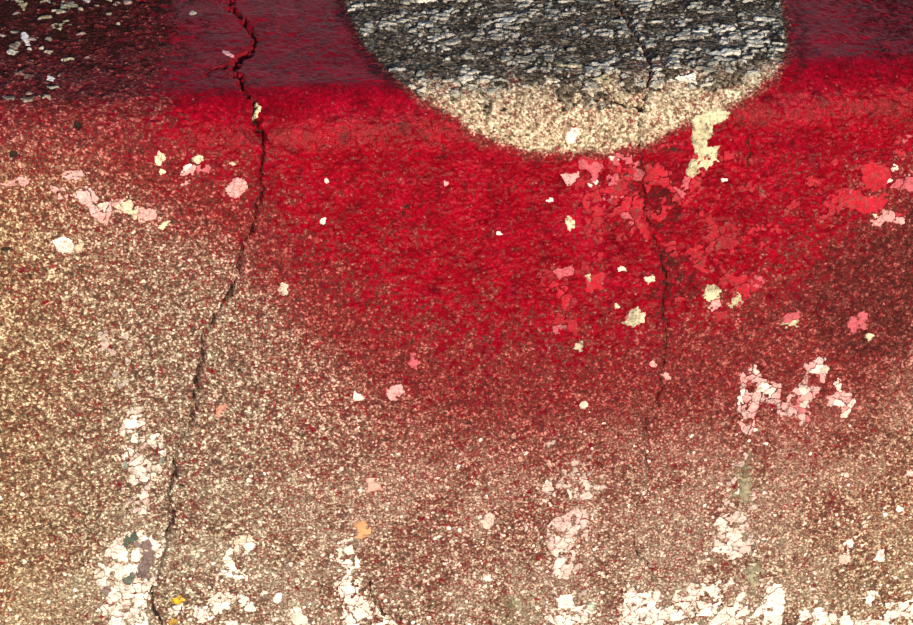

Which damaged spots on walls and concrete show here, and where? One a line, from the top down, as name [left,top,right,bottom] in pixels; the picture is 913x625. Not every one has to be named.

crack [599,2,650,217]
peeling [536,149,758,335]
crack [150,98,264,622]
peeling [735,356,856,437]
peeling [94,530,163,625]
peeling [170,592,256,625]
peeling [220,531,256,581]
peeling [333,537,396,625]
peeling [535,455,607,625]
peeling [617,577,786,625]
peeling [709,452,758,560]
peeling [797,590,913,625]